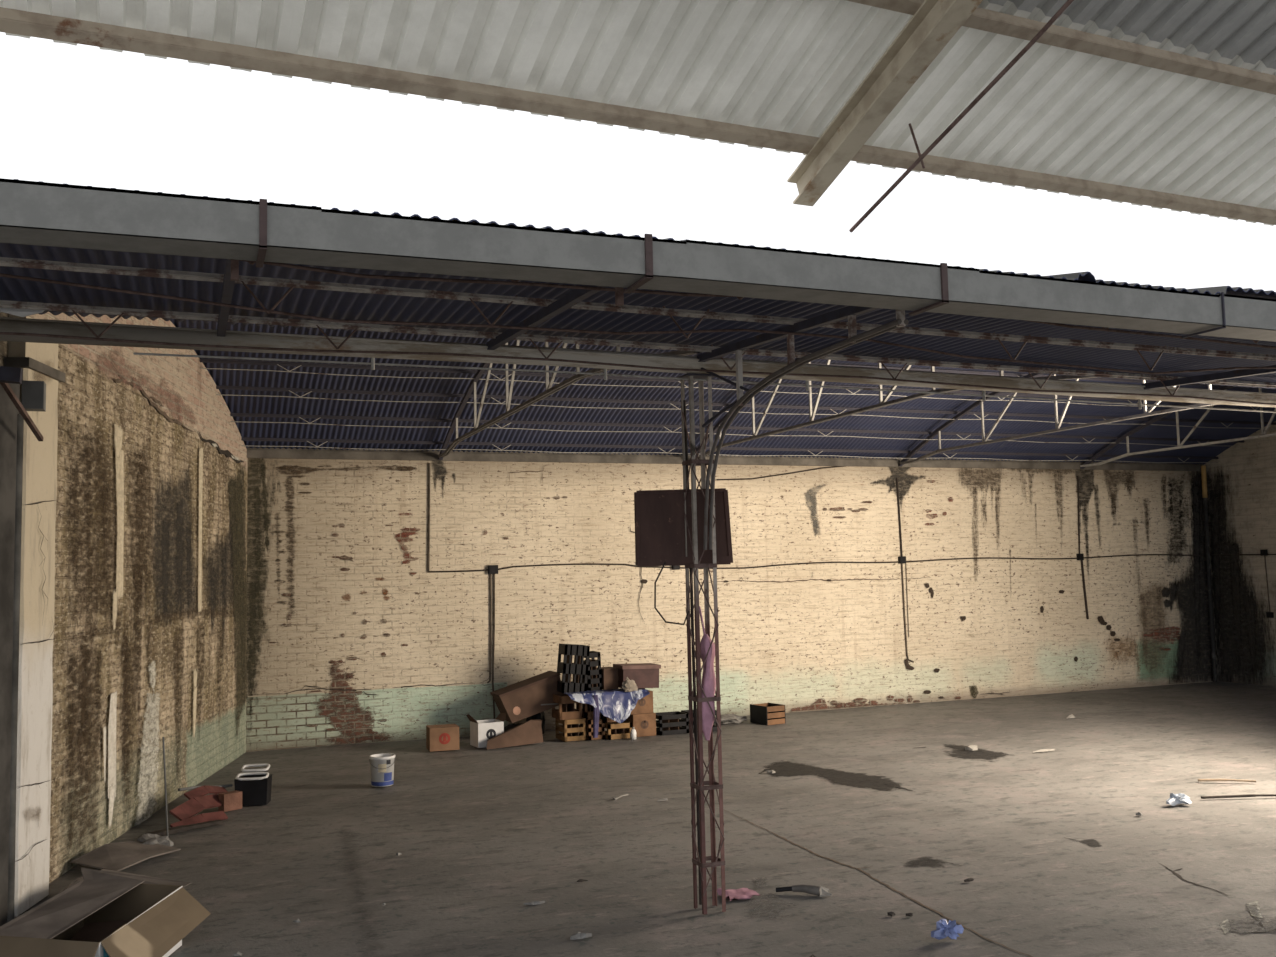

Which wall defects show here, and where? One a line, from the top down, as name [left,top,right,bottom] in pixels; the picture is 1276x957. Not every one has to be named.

peeling [388,513,418,574]
water stain [805,484,824,535]
water stain [873,467,925,504]
water stain [959,468,1135,581]
water stain [1141,469,1275,684]
water stain [62,424,296,849]
spalling [306,657,396,745]
crack [723,809,1033,957]